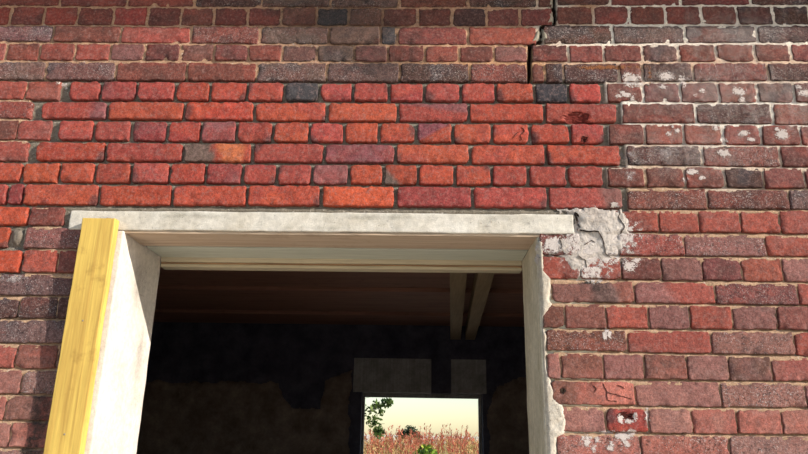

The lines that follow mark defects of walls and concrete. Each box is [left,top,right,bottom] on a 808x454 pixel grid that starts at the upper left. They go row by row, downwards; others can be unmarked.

crack [524,0,556,84]
damp [615,73,643,102]
damp [657,70,687,89]
damp [712,125,731,158]
spalling [535,207,629,275]